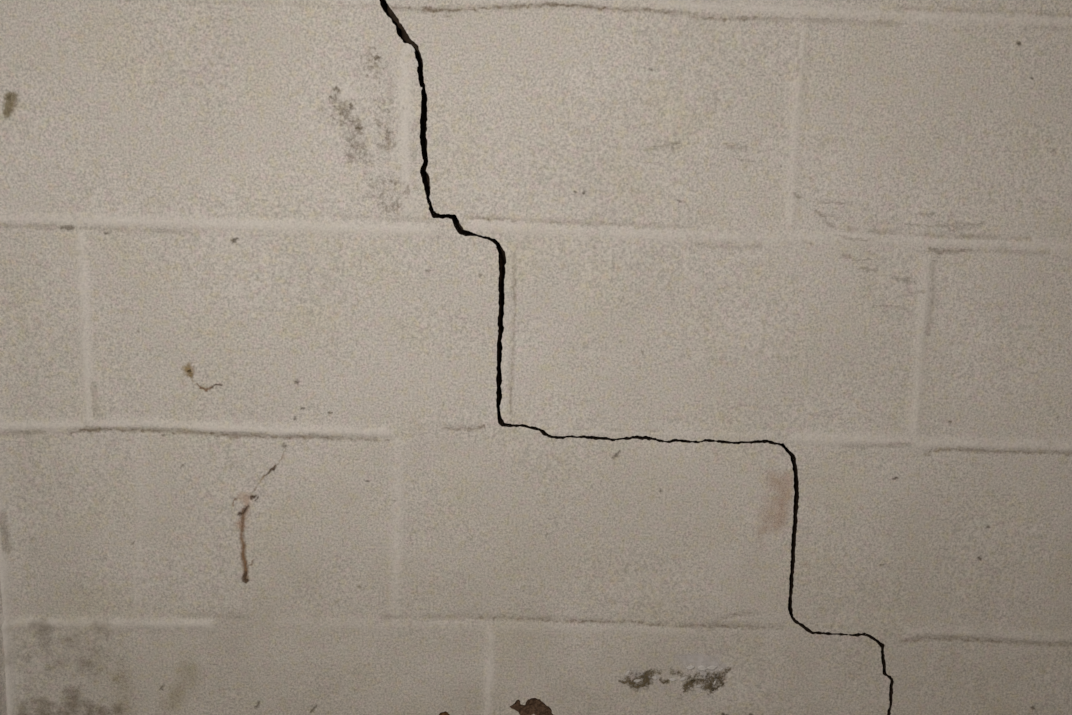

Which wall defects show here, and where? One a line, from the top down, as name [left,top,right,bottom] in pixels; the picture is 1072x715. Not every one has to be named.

rust [233,495,258,583]
crack [379,0,894,715]